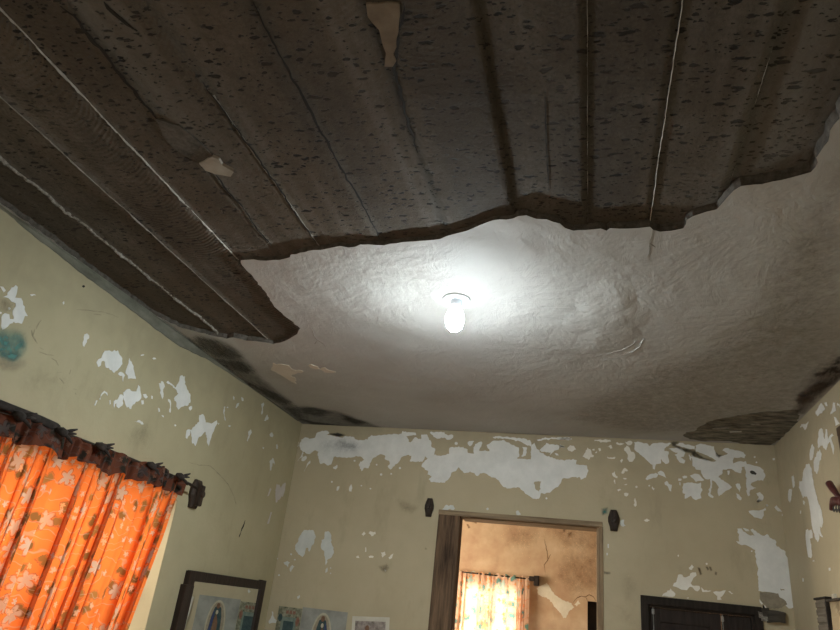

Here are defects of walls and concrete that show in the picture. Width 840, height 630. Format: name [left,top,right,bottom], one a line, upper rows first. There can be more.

spalling [0,0,840,341]
damp [0,333,24,360]
peeling [94,350,192,417]
peeling [186,396,244,446]
damp [195,338,371,437]
peeling [298,410,808,519]
peeling [788,402,840,561]
peeling [277,530,334,574]
peeling [736,528,793,609]